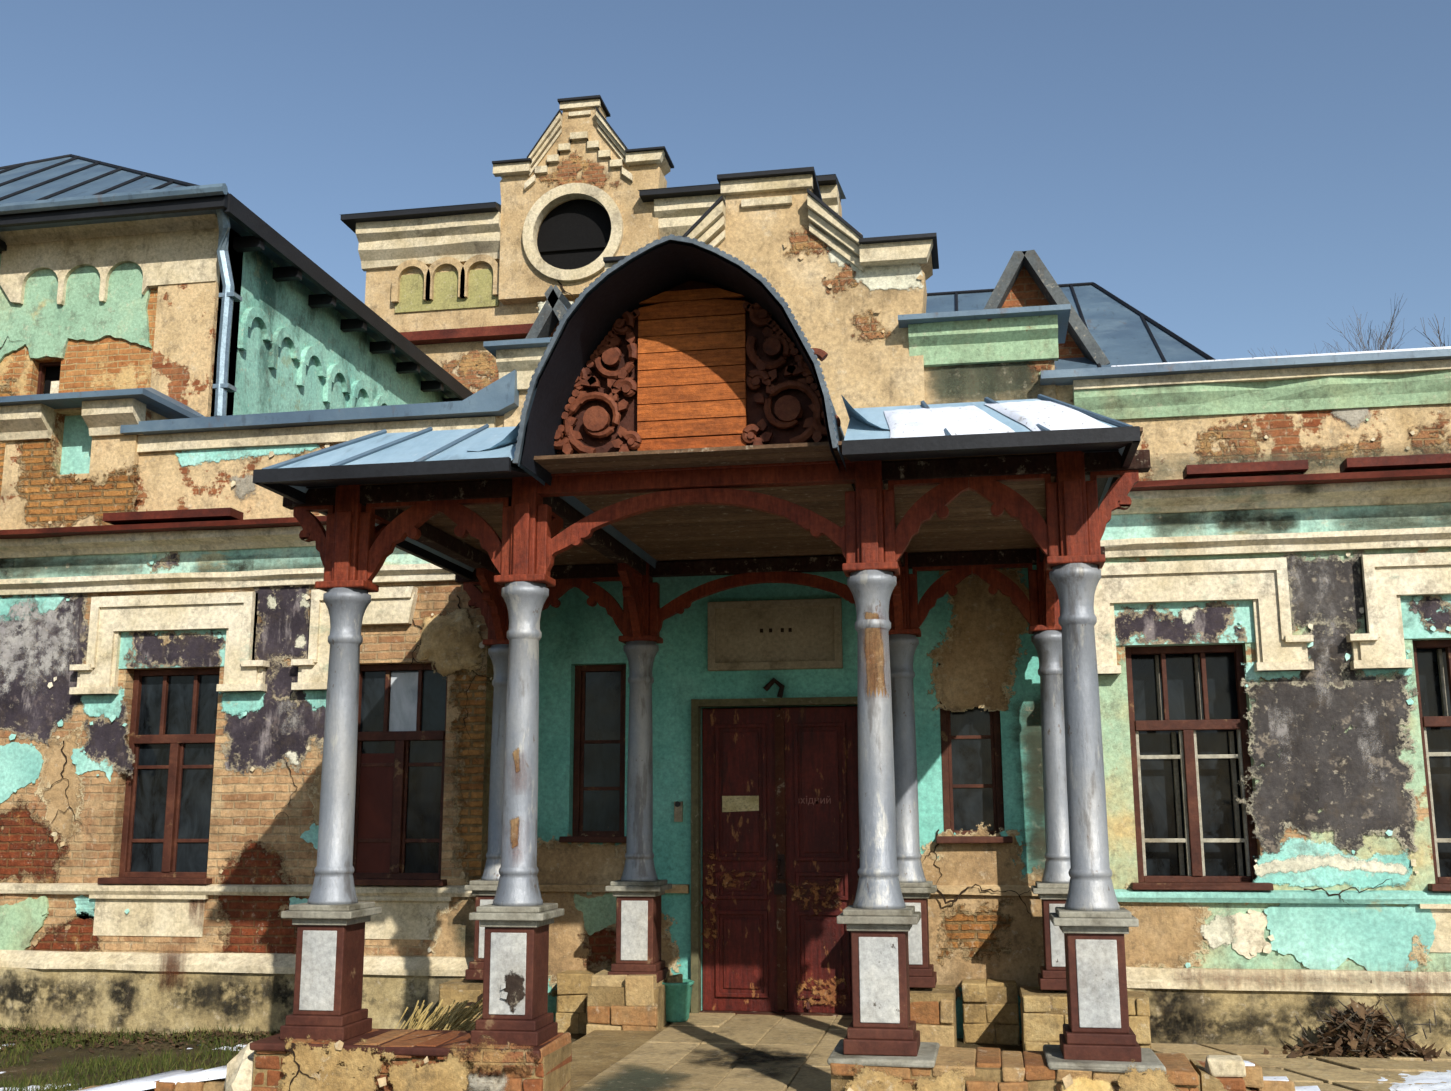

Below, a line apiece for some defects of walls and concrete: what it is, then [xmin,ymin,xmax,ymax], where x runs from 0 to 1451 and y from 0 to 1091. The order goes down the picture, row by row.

flaking render [783,226,924,345]
spalling [0,429,143,528]
peeling [1408,595,1451,634]
peeling [0,593,135,952]
peeling [219,585,327,849]
peeling [1114,550,1436,972]
spalling [213,839,308,954]
flaking render [920,822,1044,1000]
mould [0,980,138,1026]
water stain [167,983,294,1019]
water stain [1150,990,1338,1042]
water stain [1369,997,1451,1040]